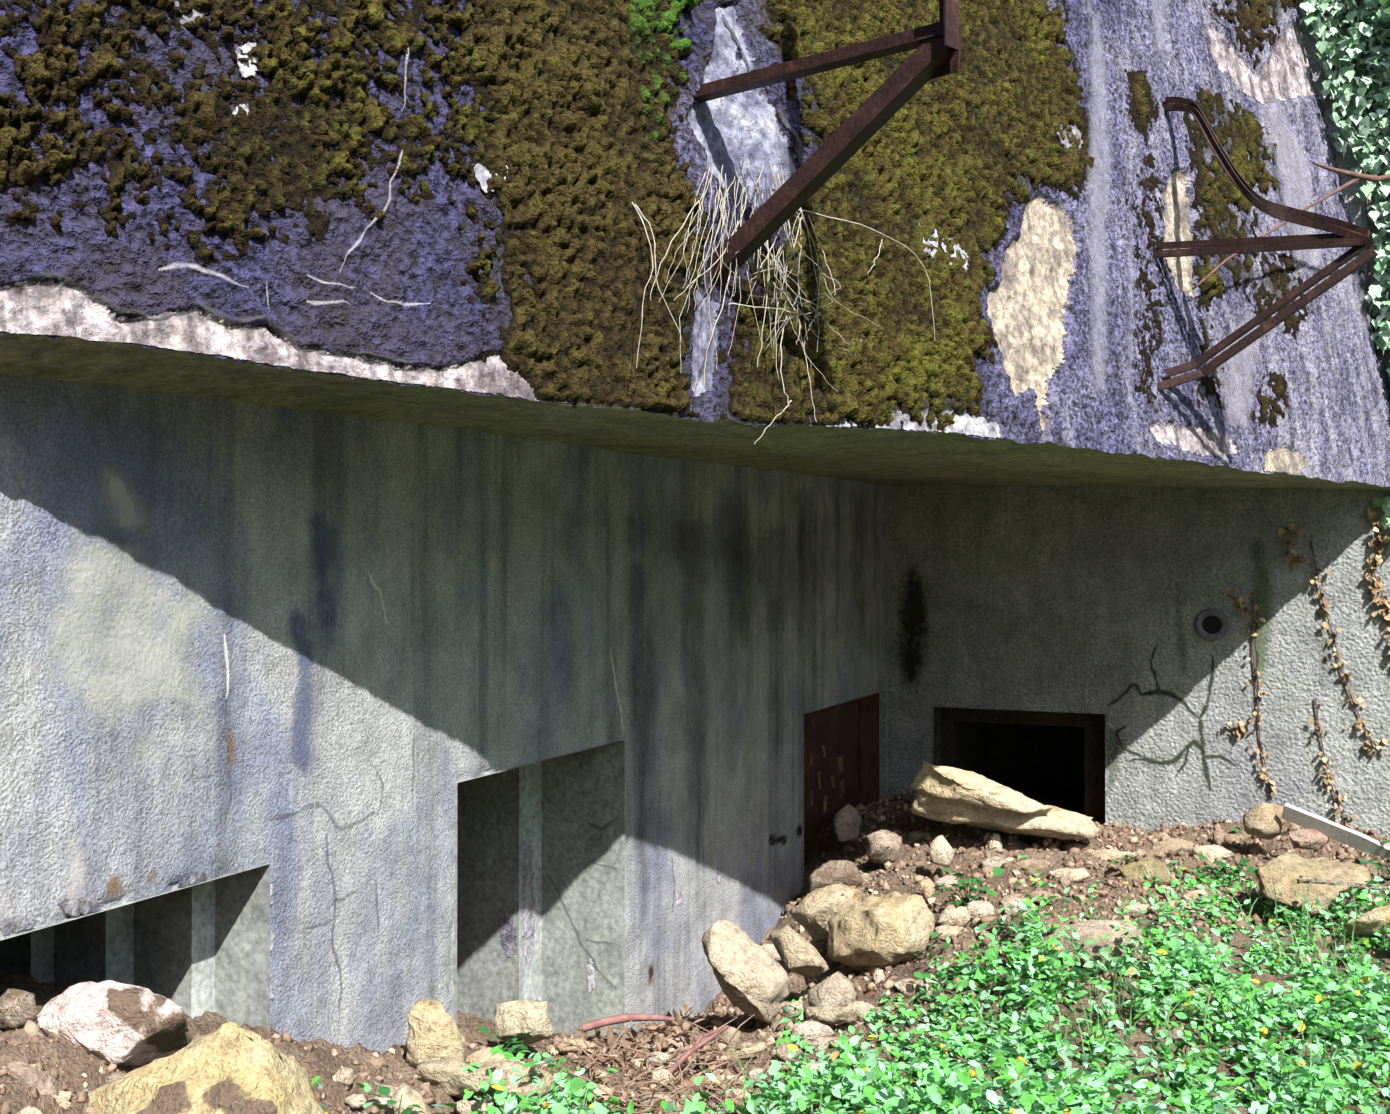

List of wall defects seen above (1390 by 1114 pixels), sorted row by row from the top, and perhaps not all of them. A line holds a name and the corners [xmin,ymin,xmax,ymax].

spalling [687,6,796,209]
peeling [1206,23,1318,104]
spalling [1162,170,1196,298]
spalling [0,279,567,403]
spalling [691,290,722,397]
spalling [986,195,1077,437]
water stain [900,568,928,682]
crack [1107,644,1236,791]
crack [265,731,415,1025]